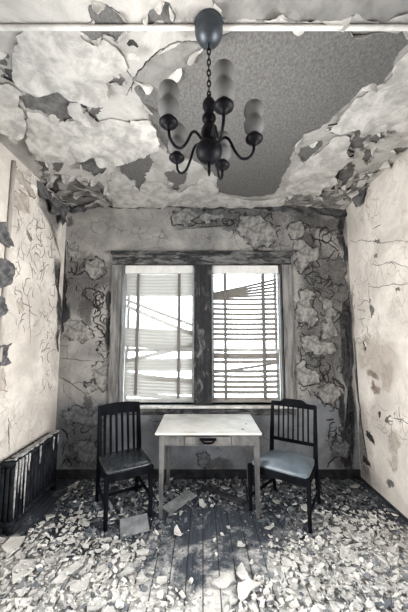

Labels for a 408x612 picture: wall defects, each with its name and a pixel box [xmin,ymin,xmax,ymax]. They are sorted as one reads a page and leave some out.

peeling [0,0,408,250]
peeling [0,296,9,317]
peeling [0,258,16,288]
crack [14,210,110,467]
peeling [66,240,104,281]
peeling [83,360,109,394]
peeling [286,220,349,409]
crack [297,222,408,472]